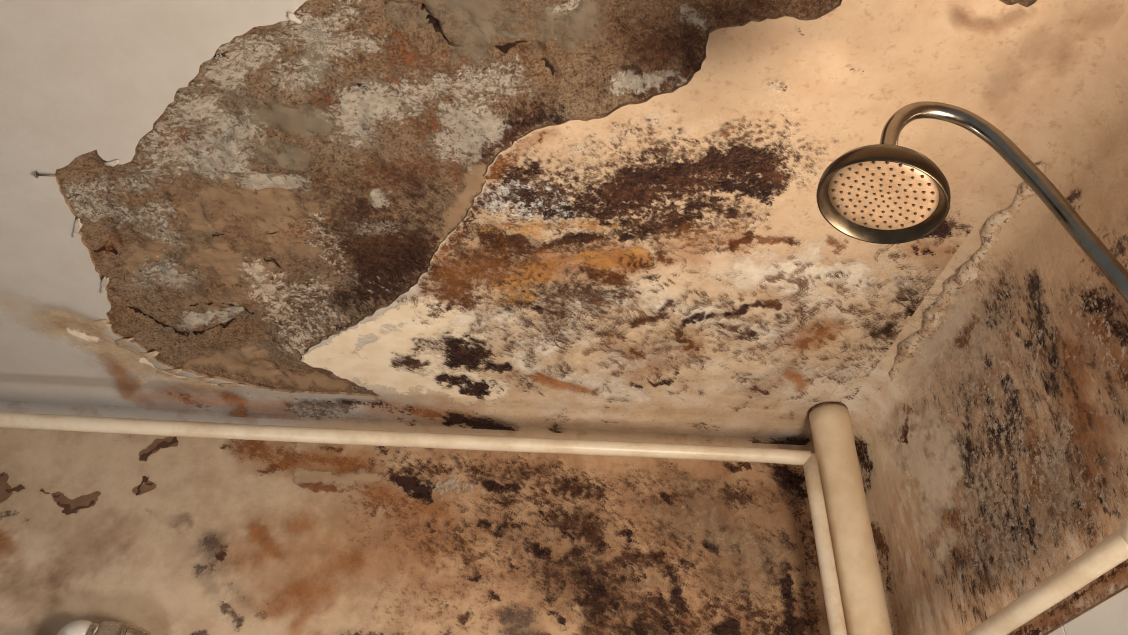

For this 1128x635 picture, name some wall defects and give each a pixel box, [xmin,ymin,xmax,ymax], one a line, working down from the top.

spalling [38,0,841,395]
rust [489,247,653,304]
leakage [263,49,1128,635]
peeling [139,436,179,462]
rust [221,439,372,476]
peeling [0,472,25,503]
peeling [40,489,101,515]
peeling [132,476,156,495]
leakage [194,535,228,577]
rust [342,489,512,633]
leakage [220,601,268,629]